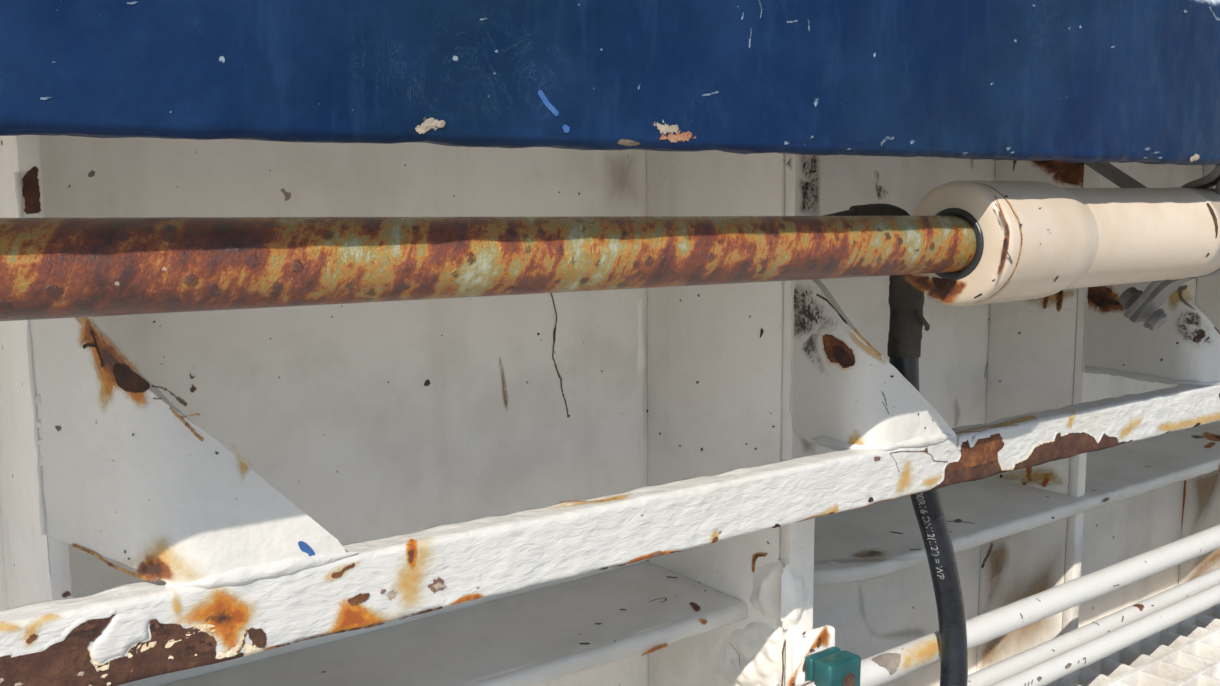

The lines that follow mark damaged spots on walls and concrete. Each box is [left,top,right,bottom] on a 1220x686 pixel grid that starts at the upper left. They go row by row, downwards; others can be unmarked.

peeling [654,122,696,143]
rust [22,166,41,214]
rust [1032,160,1084,186]
rust [904,182,1023,304]
rust [80,317,150,405]
crack [550,293,570,418]
rust [821,329,884,370]
rust [169,407,204,441]
rust [600,551,676,570]
peeling [0,614,57,645]
rust [0,539,483,686]